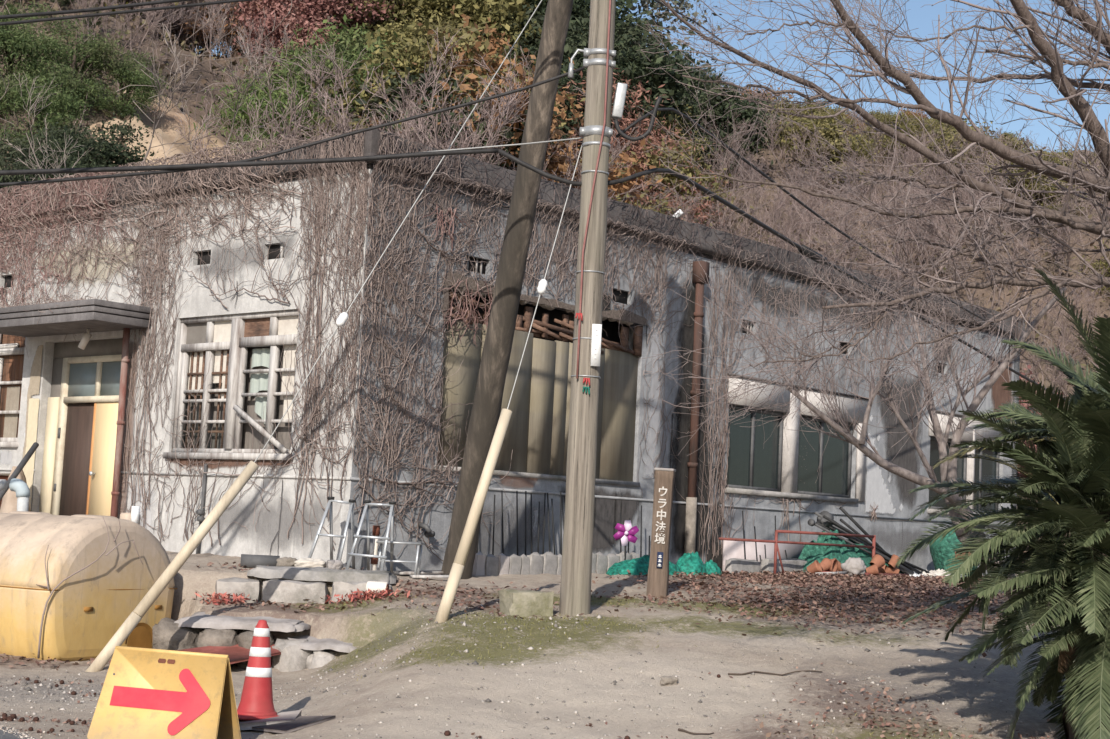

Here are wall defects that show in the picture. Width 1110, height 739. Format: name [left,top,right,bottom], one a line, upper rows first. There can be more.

water stain [740,276,895,327]